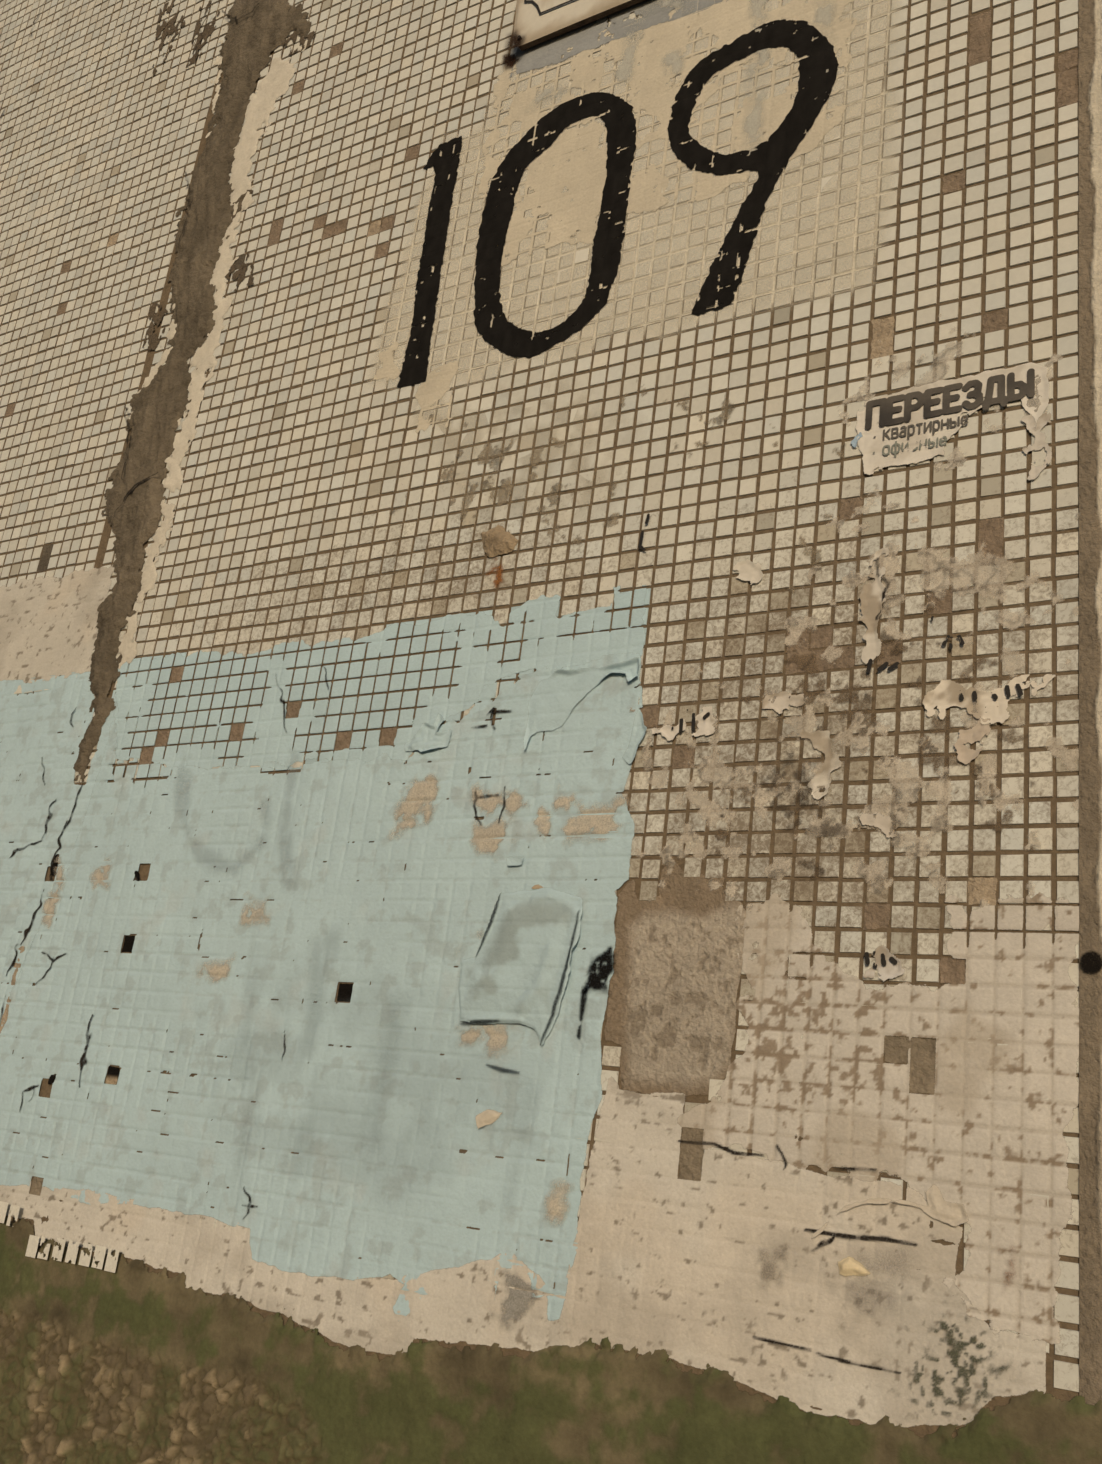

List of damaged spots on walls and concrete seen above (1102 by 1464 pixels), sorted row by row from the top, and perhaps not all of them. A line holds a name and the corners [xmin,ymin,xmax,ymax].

crack [0,0,316,1033]
spalling [977,517,1004,565]
spalling [785,626,855,675]
peeling [379,714,451,752]
peeling [524,657,639,750]
peeling [623,705,659,764]
spalling [672,746,695,769]
peeling [472,787,625,853]
spalling [604,859,749,1097]
crack [79,1014,93,1088]
crack [20,1085,39,1109]
spalling [29,1176,44,1196]